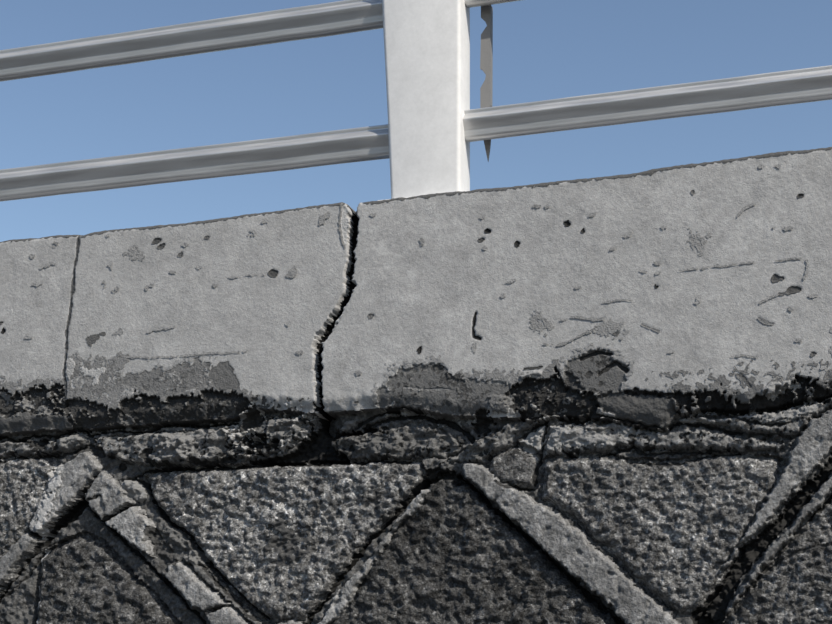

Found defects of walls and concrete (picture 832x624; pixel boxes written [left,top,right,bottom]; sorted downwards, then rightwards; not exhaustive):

crack [127,349,248,359]
crack [316,203,475,444]
spalling [377,348,832,462]
crack [0,527,68,603]
spalling [46,497,90,547]
spalling [143,526,183,573]
crack [81,459,412,624]
crack [302,480,432,624]
spalling [421,467,466,487]
spalling [690,452,832,624]